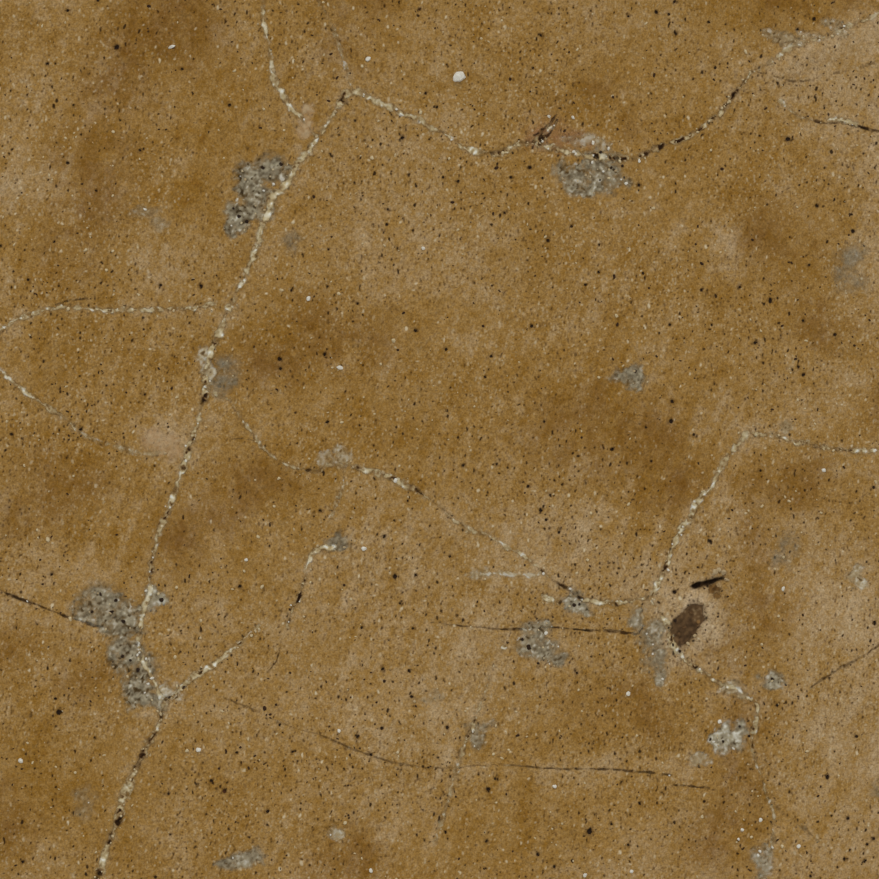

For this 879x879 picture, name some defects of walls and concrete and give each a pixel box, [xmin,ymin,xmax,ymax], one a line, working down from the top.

crack [257,4,304,122]
crack [767,12,879,82]
crack [780,100,879,132]
spalling [224,158,292,238]
spalling [558,133,640,197]
crack [0,71,755,879]
spalling [72,586,181,711]
spalling [517,621,568,667]
crack [442,431,879,851]
spalling [691,719,751,766]